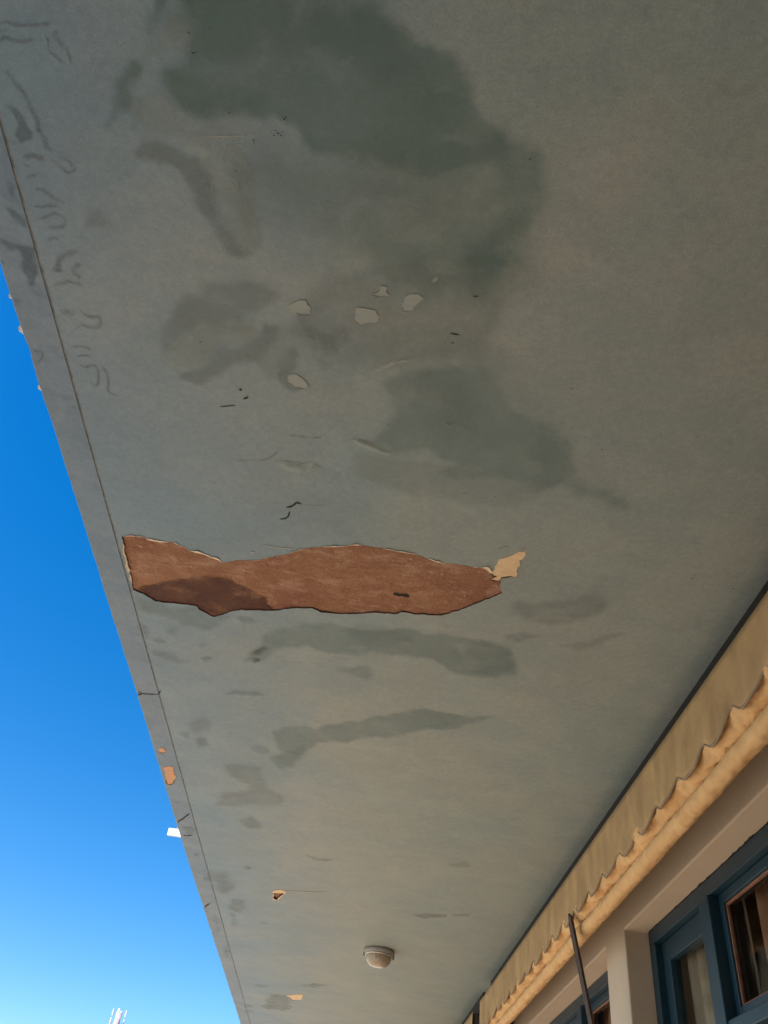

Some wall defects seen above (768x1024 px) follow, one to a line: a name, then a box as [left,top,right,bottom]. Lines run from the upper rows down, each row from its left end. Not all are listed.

spalling [121,536,526,617]
peeling [164,766,176,785]